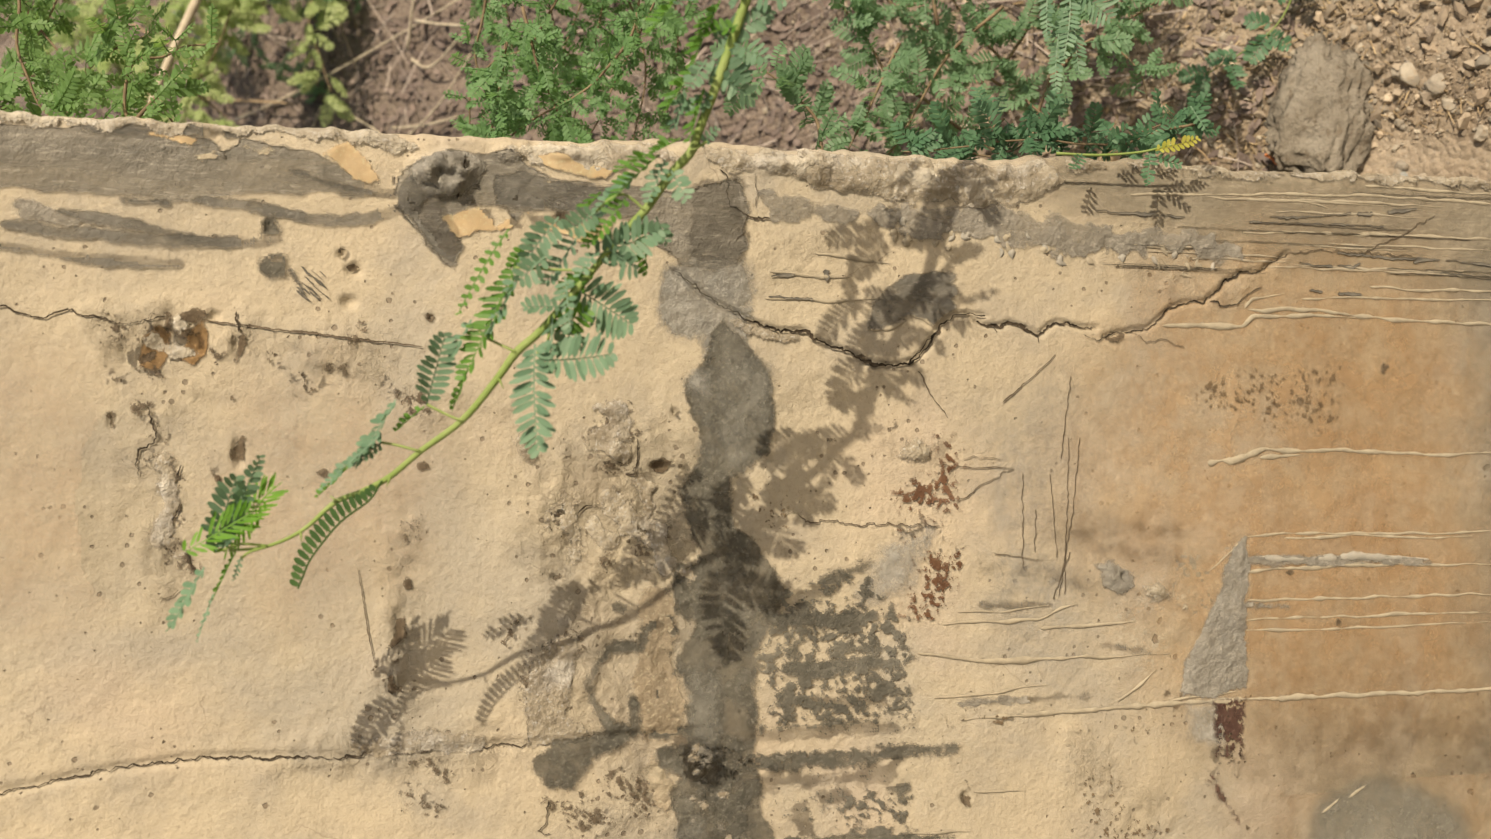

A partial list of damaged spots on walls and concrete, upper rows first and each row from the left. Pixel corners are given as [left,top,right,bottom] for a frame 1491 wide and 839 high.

water stain [0,122,1491,303]
crack [0,305,166,324]
crack [202,312,422,347]
water stain [868,271,959,331]
crack [675,215,1435,418]
water stain [1186,360,1344,431]
rust [893,433,959,522]
water stain [532,321,958,839]
rust [897,528,963,623]
water stain [1180,536,1491,698]
crack [0,697,551,795]
rust [1195,699,1245,821]